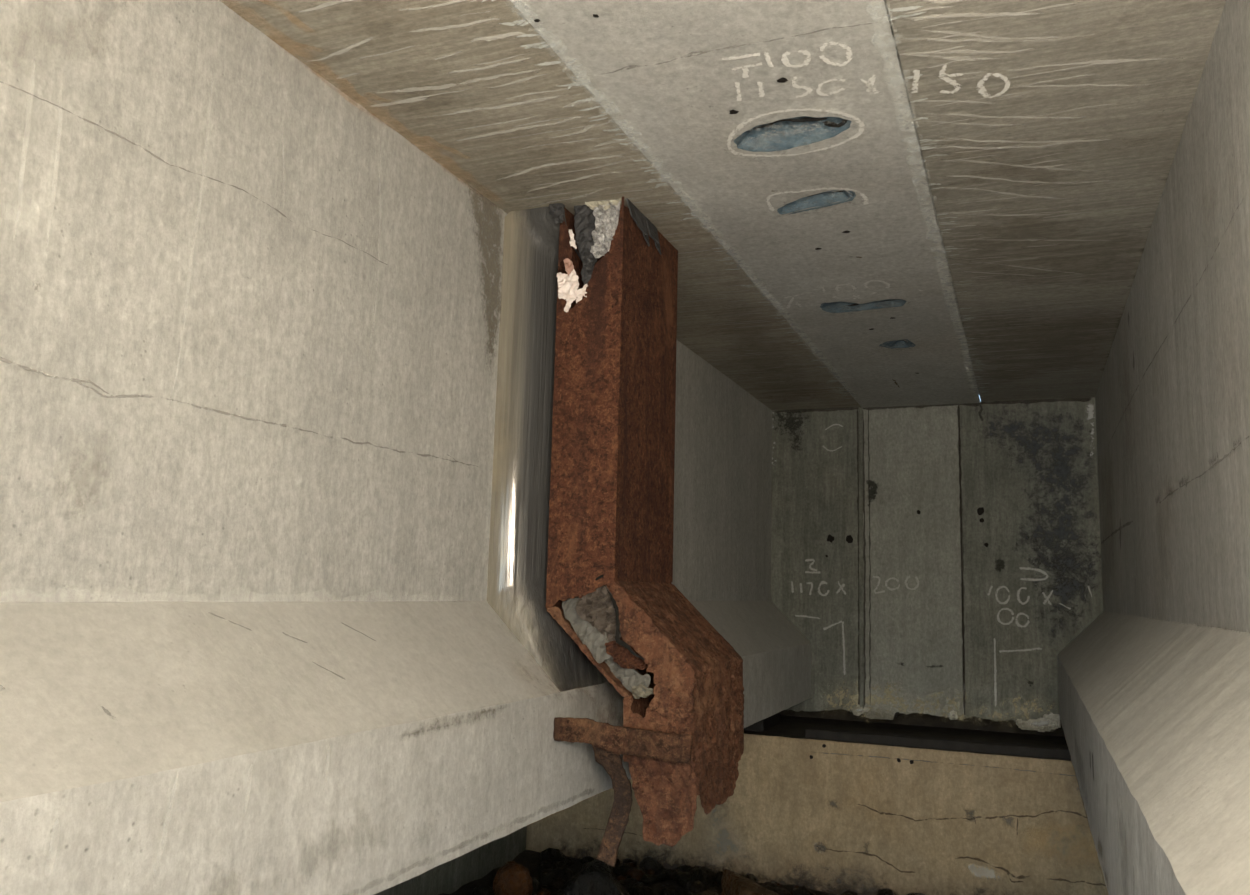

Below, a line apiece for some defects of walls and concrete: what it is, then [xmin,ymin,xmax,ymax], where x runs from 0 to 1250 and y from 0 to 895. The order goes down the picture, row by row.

damp [887,0,1077,80]
crack [1,82,388,265]
peeling [557,229,588,312]
damp [910,57,1162,645]
crack [0,357,475,466]
crack [827,849,915,873]
crack [857,804,1088,835]
crack [955,856,1106,886]